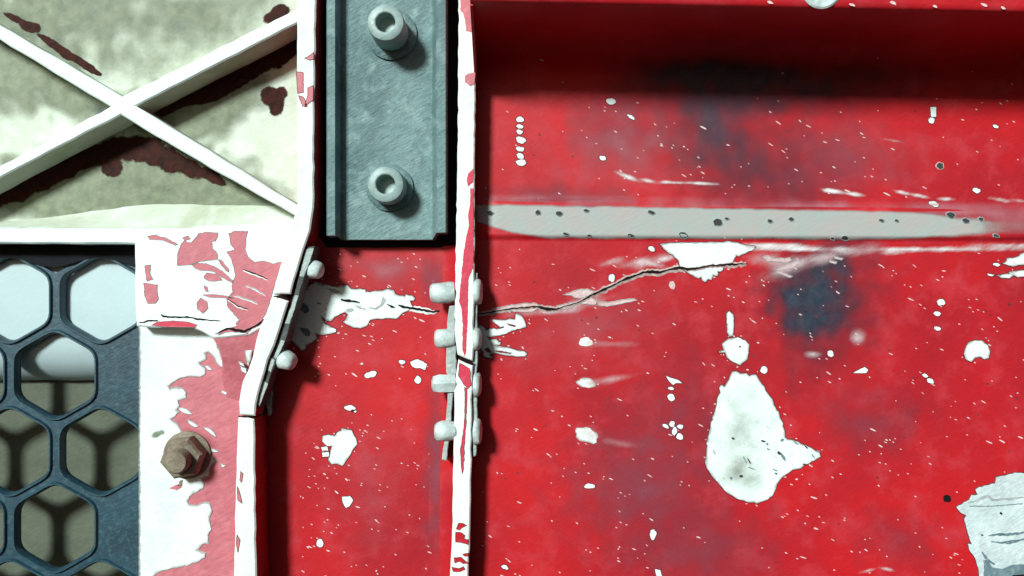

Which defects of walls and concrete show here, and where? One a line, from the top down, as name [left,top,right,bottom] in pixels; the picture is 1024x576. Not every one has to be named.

spalling [928,200,984,224]
peeling [177,232,233,283]
peeling [648,217,801,283]
crack [340,297,360,305]
peeling [291,280,416,352]
crack [386,303,440,315]
crack [478,261,747,317]
peeling [963,339,991,363]
peeling [704,310,822,506]
peeling [138,326,226,576]
peeling [320,427,358,469]
peeling [943,472,1024,576]